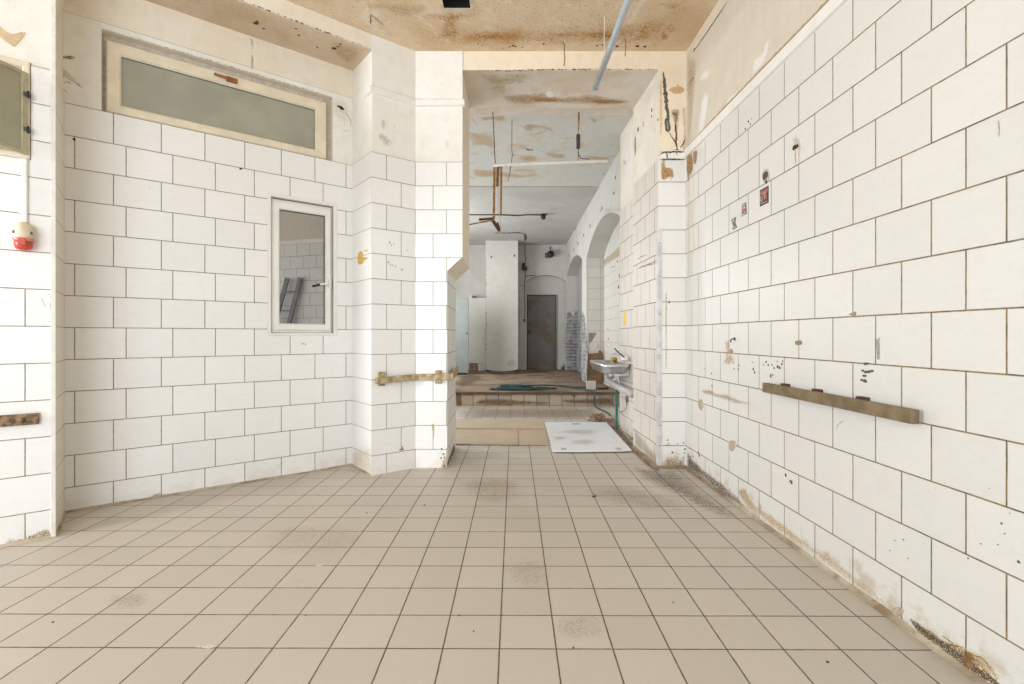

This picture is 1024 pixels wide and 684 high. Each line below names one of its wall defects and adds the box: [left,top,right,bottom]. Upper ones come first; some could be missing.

leakage [367,1,679,49]
leakage [463,69,629,106]
leakage [585,430,883,602]
leakage [910,620,1000,684]